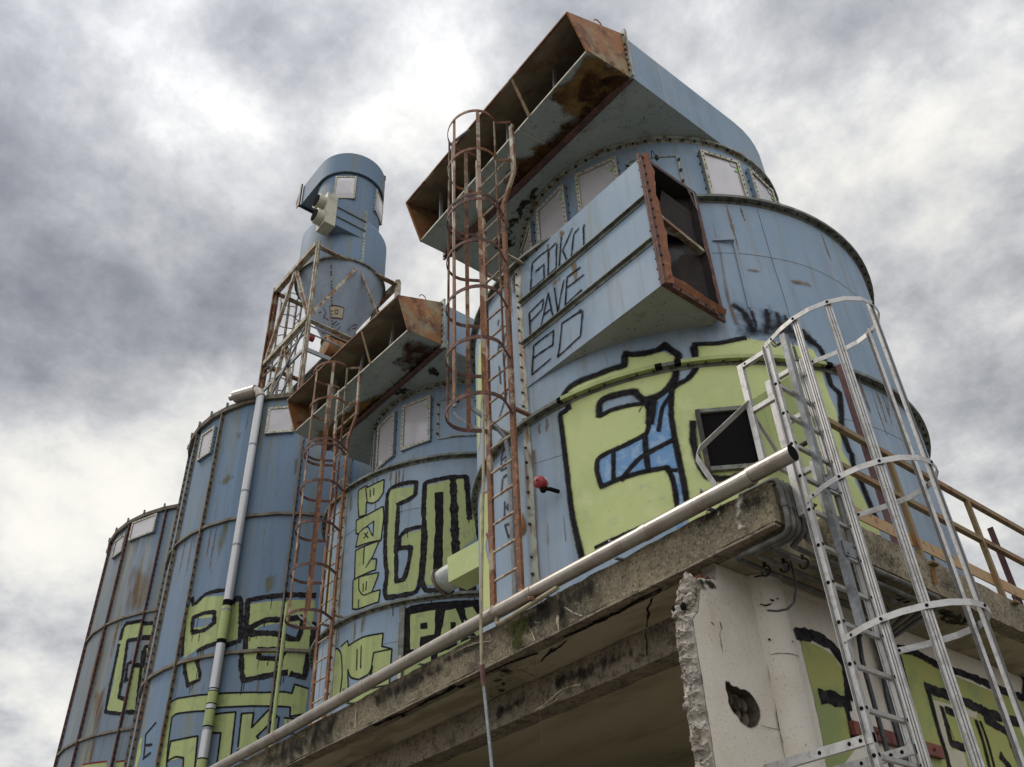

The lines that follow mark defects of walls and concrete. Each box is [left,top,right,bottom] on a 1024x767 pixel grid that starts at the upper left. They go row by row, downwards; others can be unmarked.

corrosion [504,56,628,187]
damp [528,581,592,641]
crack [637,590,662,657]
damp [555,649,632,688]
spalling [671,572,715,767]
spalling [725,680,761,728]